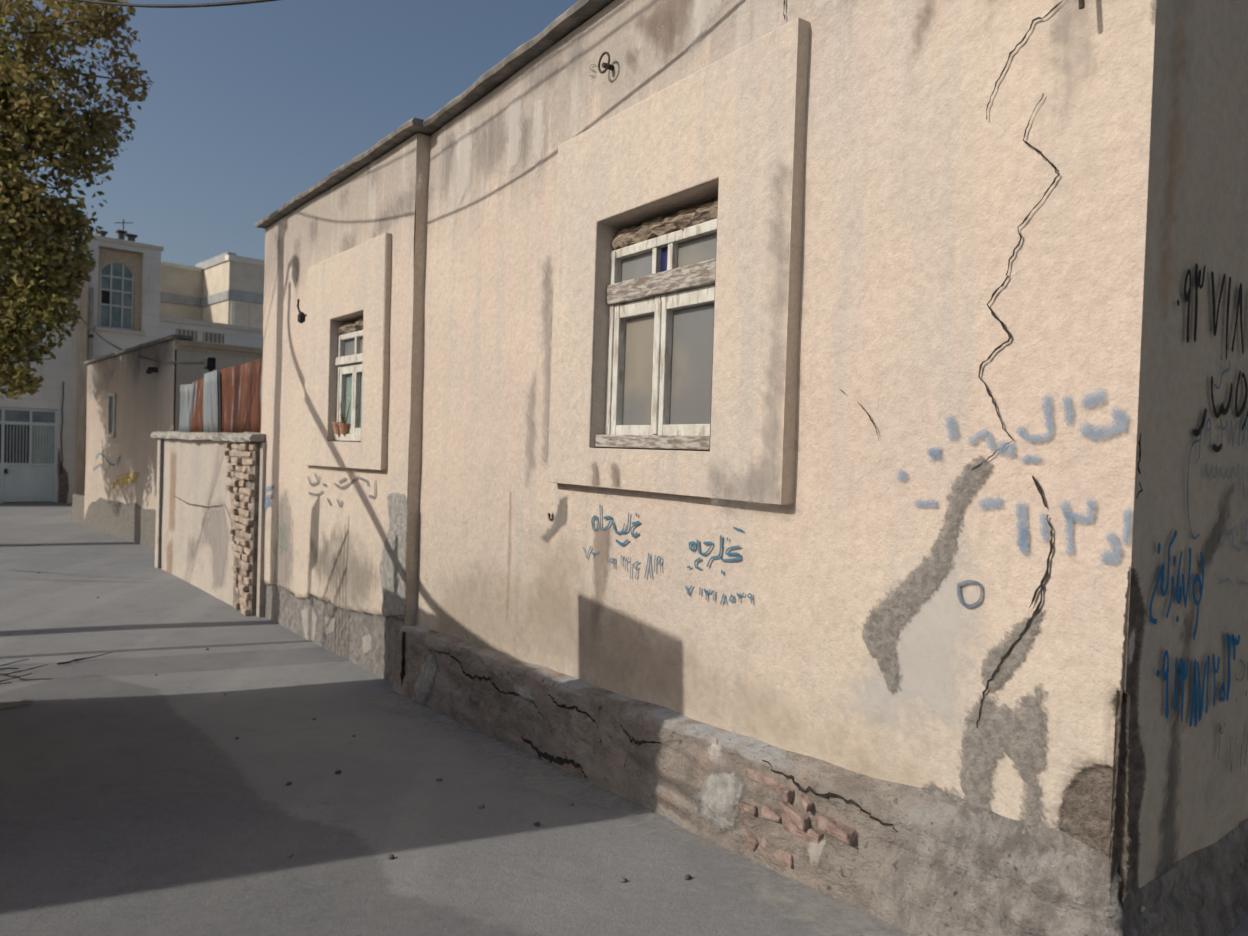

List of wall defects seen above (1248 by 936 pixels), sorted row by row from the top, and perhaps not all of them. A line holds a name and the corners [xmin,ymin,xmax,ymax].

crack [986,0,1063,119]
damp [443,100,545,201]
crack [972,93,1060,469]
crack [976,476,1053,728]
crack [400,632,661,778]